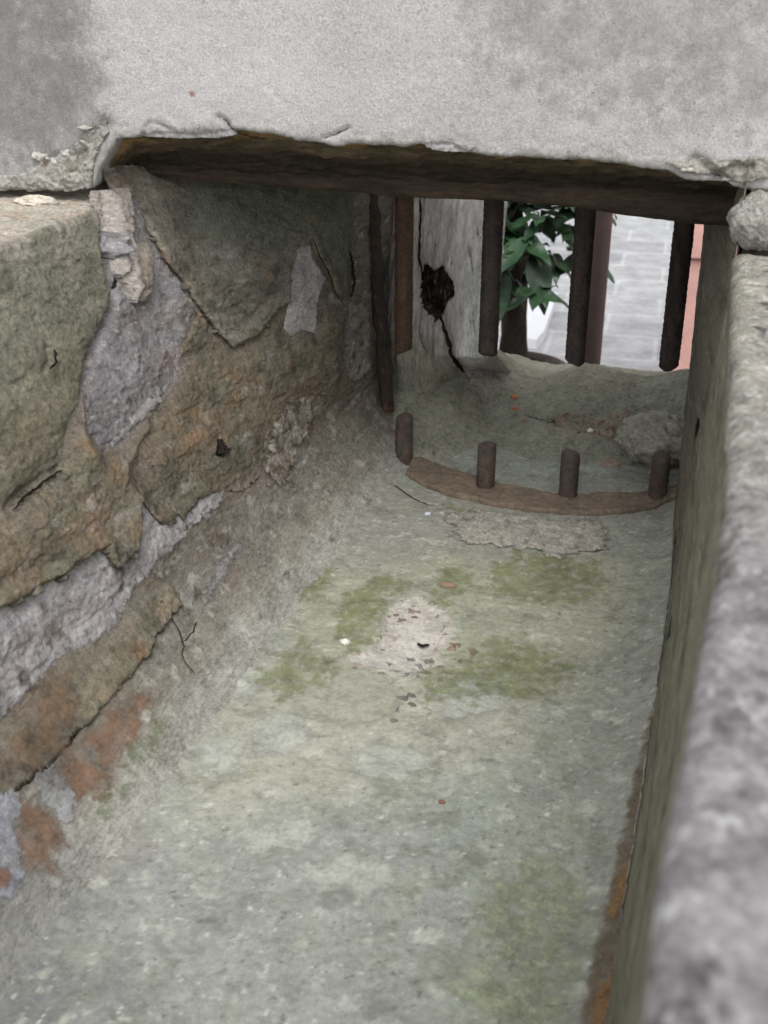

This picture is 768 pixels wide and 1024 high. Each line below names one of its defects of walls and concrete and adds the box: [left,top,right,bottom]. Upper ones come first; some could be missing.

crack [417,198,425,281]
crack [419,309,464,372]
crack [12,469,63,510]
peeling [0,118,768,922]
crack [160,600,197,673]
corrosion [582,712,653,1024]